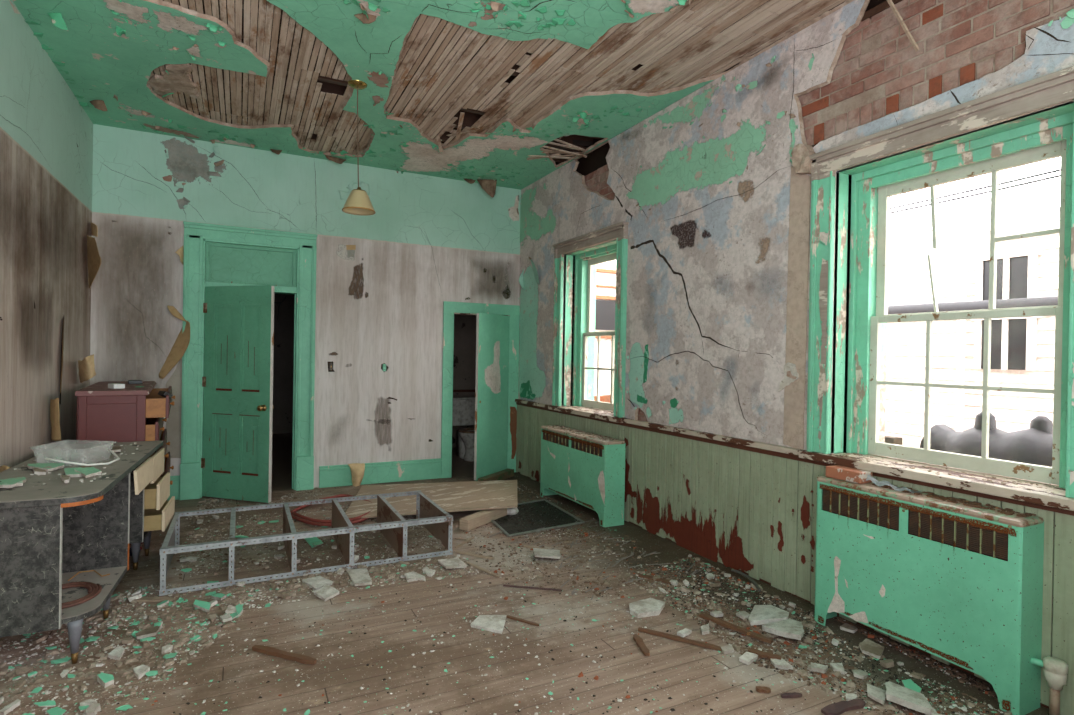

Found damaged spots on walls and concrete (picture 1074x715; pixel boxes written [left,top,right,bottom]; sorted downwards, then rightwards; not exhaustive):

peeling [353,0,381,24]
peeling [89,65,375,209]
flaking render [367,0,1074,210]
crack [577,143,792,432]
peeling [624,438,754,572]